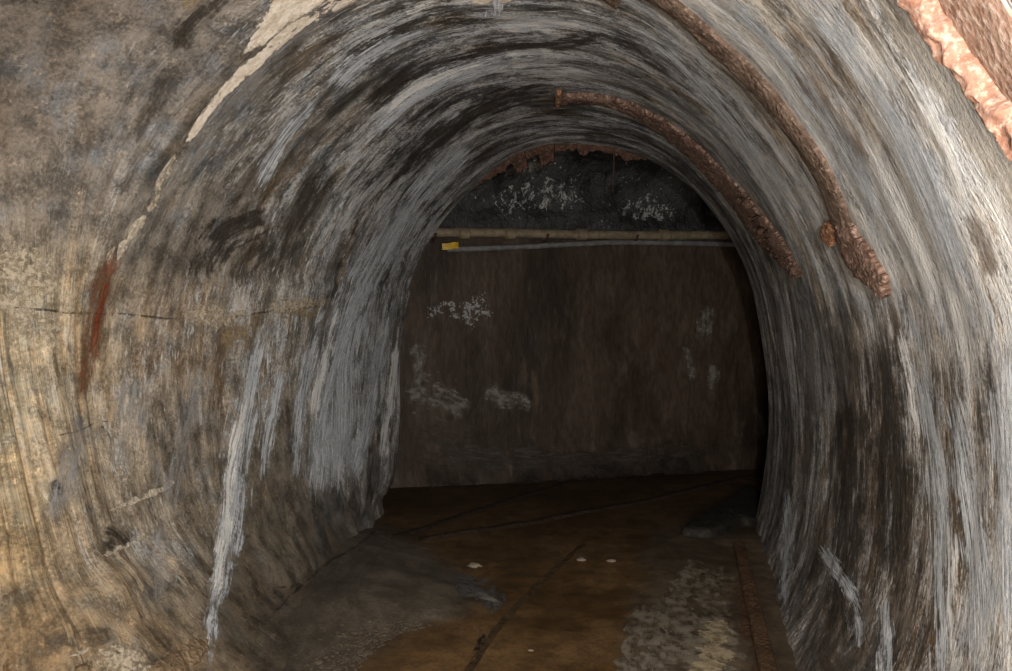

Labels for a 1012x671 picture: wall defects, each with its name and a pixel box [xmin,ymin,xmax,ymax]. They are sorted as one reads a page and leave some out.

flaking render [186,0,355,147]
damp [327,17,430,89]
damp [366,33,604,135]
flaking render [106,155,177,265]
corrosion [475,144,647,187]
corrosion [555,90,803,279]
corrosion [79,256,121,394]
damp [189,78,546,671]